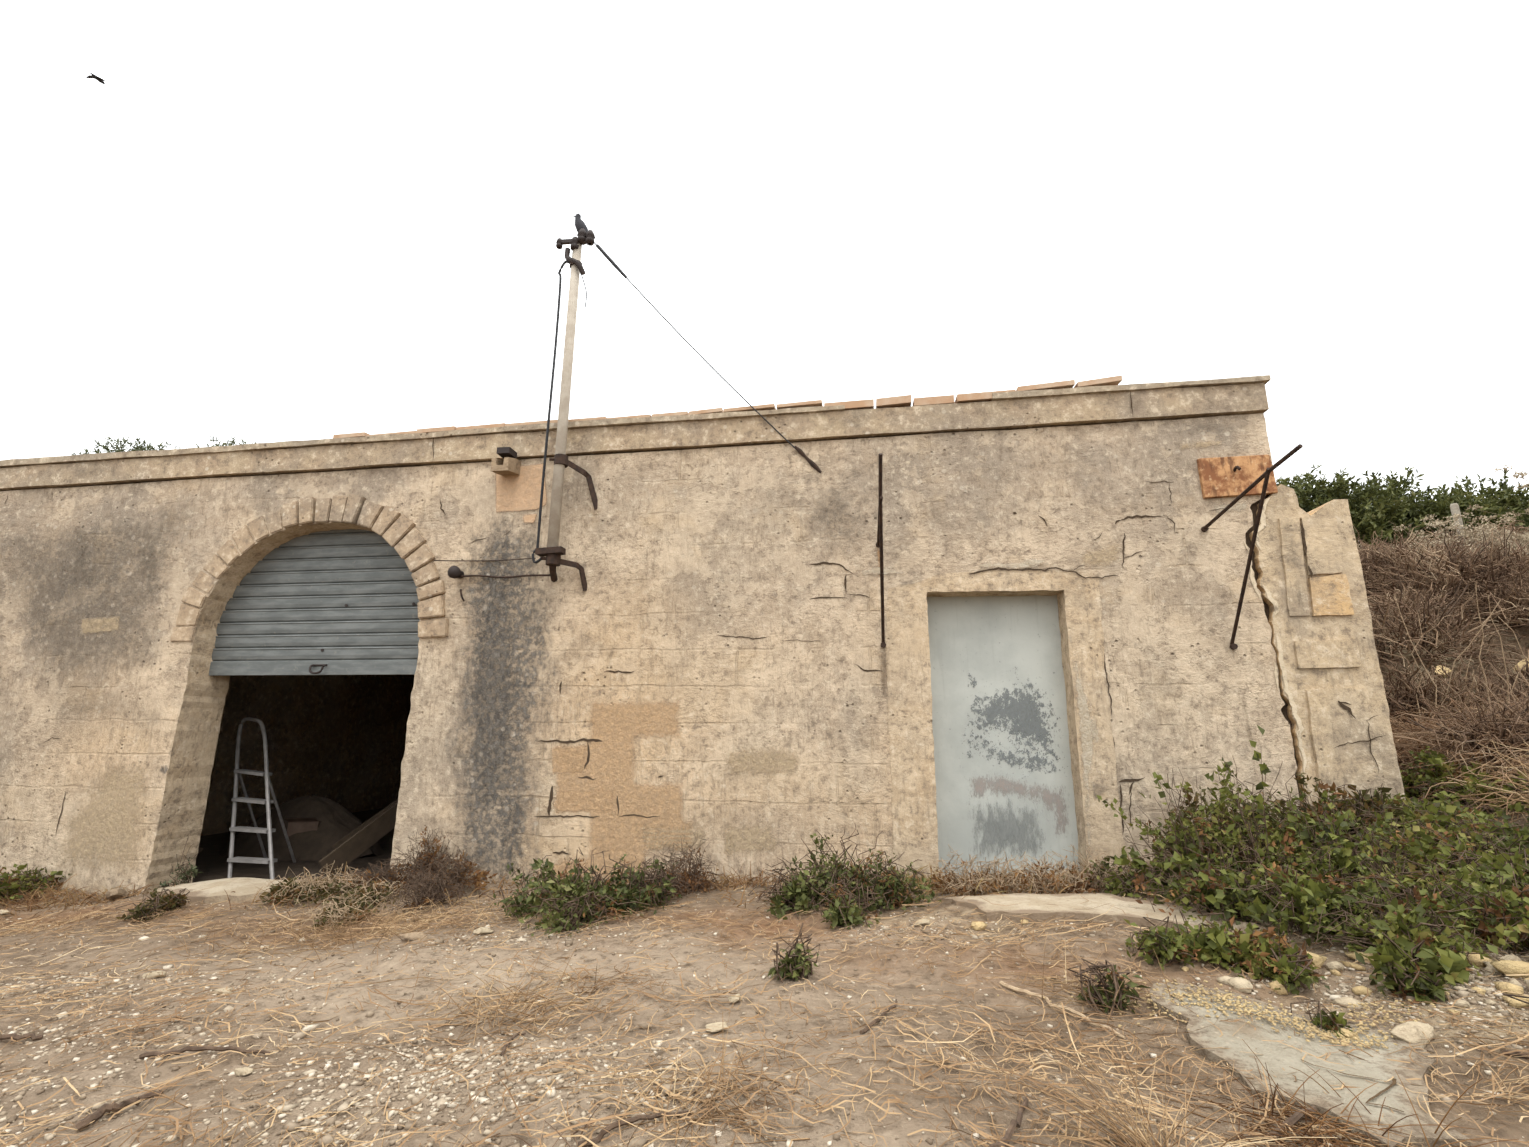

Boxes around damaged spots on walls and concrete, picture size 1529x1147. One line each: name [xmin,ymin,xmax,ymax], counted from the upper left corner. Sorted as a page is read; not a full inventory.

damp [455,523,555,880]
crack [969,481,1175,579]
crack [1210,494,1386,802]